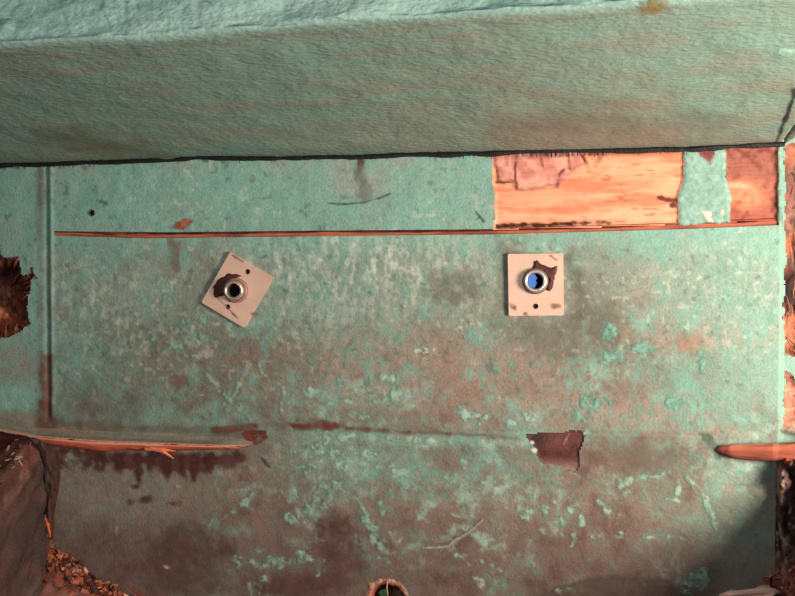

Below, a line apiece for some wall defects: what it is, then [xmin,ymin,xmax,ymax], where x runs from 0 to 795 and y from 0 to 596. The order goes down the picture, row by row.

peeling [492,143,795,357]
peeling [600,340,655,365]
spalling [526,395,615,471]
spalling [782,371,795,431]